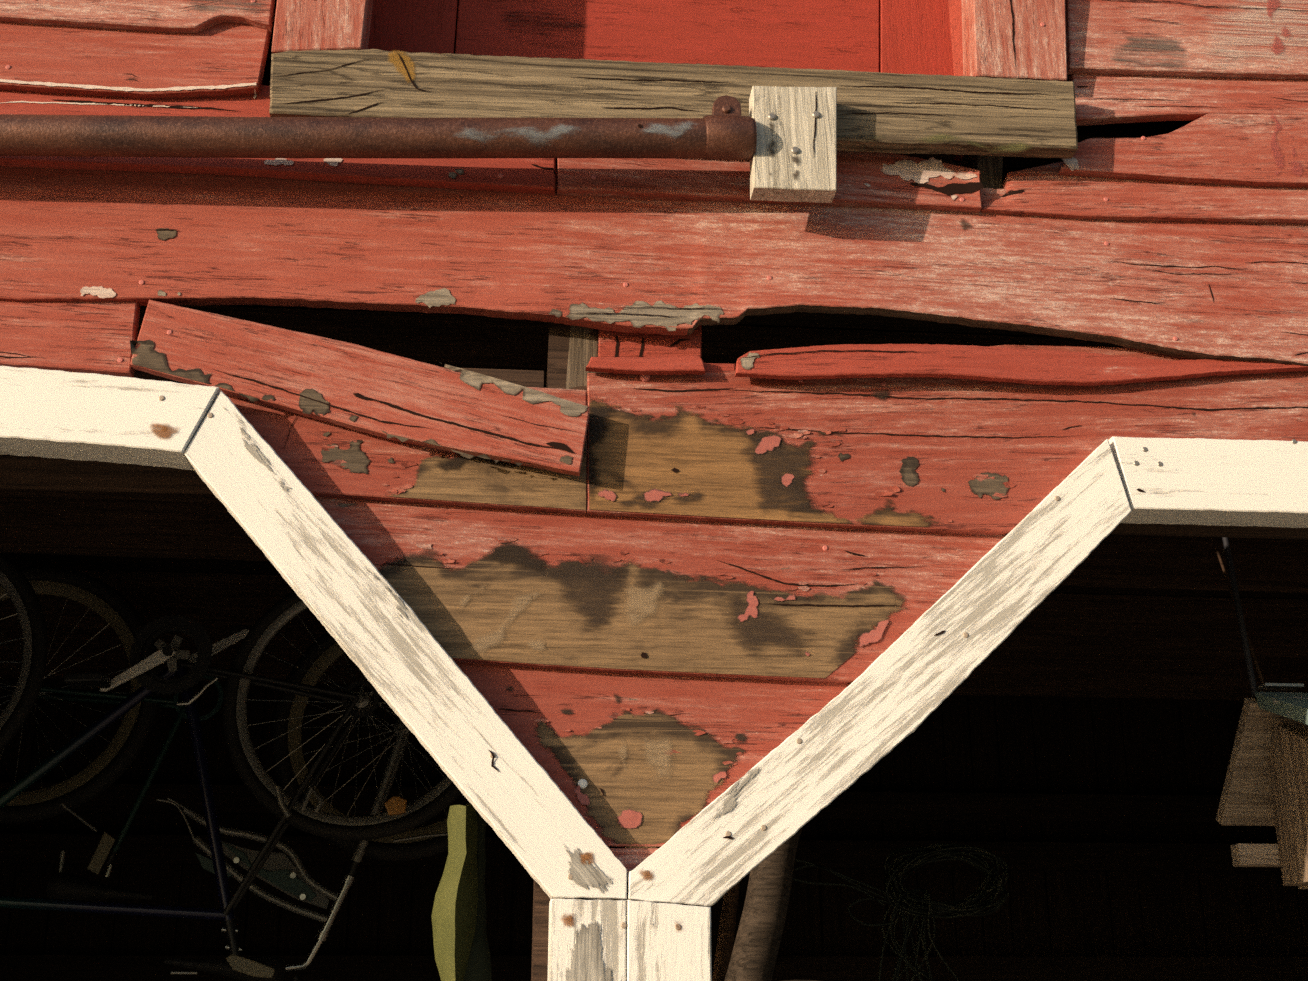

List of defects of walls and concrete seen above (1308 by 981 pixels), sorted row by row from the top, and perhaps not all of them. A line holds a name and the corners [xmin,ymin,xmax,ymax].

crack [813,0,1225,153]
peeling [880,157,977,184]
crack [1109,261,1308,304]
peeling [130,340,275,402]
peeling [298,389,330,416]
peeling [321,432,371,474]
peeling [381,364,952,527]
peeling [968,472,1016,500]
peeling [360,537,906,678]
peeling [534,694,767,848]
peeling [559,921,612,981]